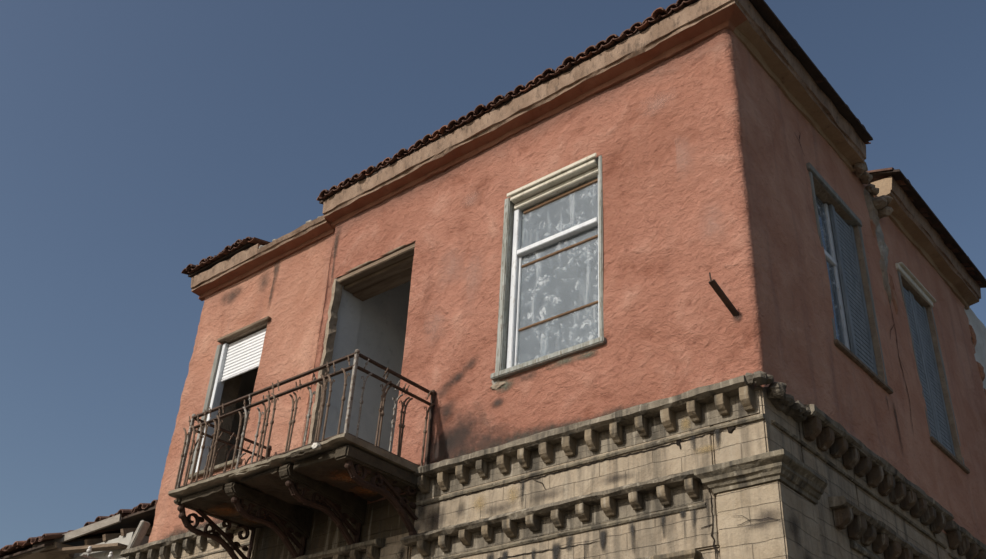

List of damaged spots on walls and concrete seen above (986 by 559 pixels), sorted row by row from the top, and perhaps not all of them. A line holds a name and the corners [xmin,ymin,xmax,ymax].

water stain [434,422,576,458]
crack [702,488,717,559]
water stain [552,536,573,559]